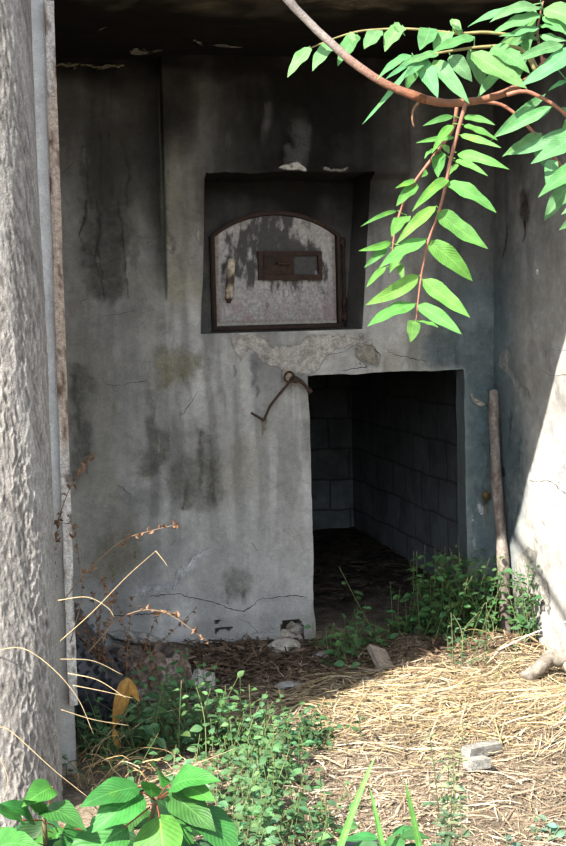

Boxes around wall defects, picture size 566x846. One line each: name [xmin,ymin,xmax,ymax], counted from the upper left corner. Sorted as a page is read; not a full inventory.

leakage [79,125,132,297]
spalling [231,333,378,374]
leakage [173,432,218,510]
crack [527,479,566,494]
crack [110,592,311,634]